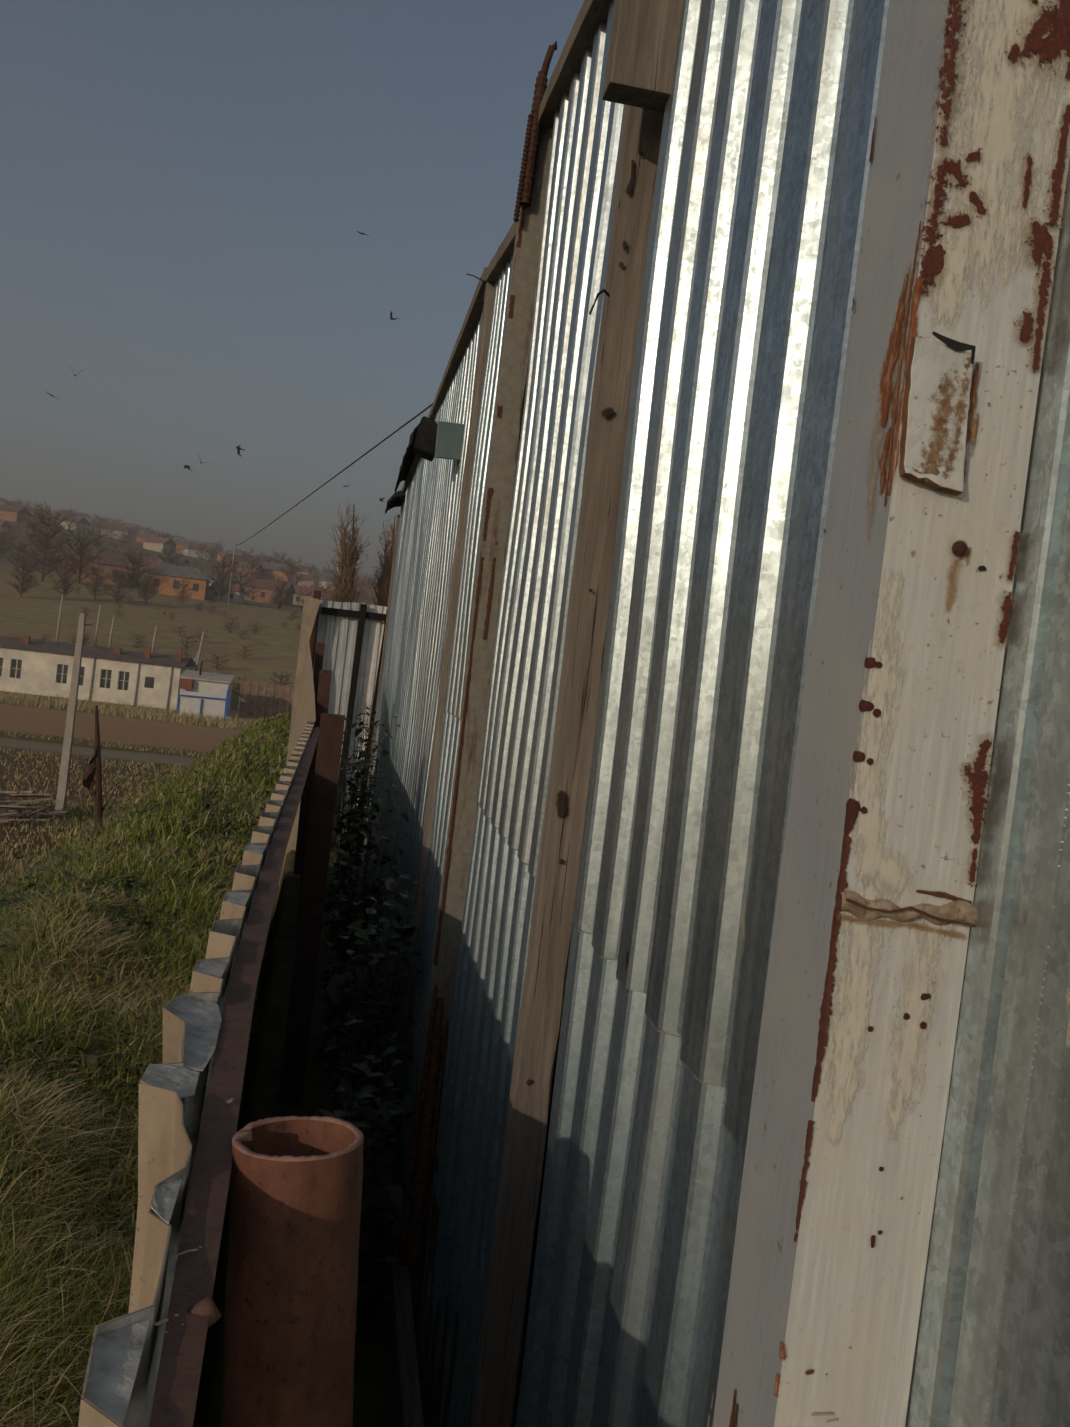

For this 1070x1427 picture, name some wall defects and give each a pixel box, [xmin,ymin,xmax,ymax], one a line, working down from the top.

peeling [916,0,1070,373]
corrosion [853,751,873,765]
corrosion [859,700,881,717]
corrosion [864,657,883,668]
peeling [843,574,908,900]
corrosion [811,798,868,1102]
peeling [826,911,893,1144]
peeling [887,918,954,1141]
corrosion [794,1120,815,1242]
corrosion [729,1390,738,1427]
corrosion [774,1342,786,1396]